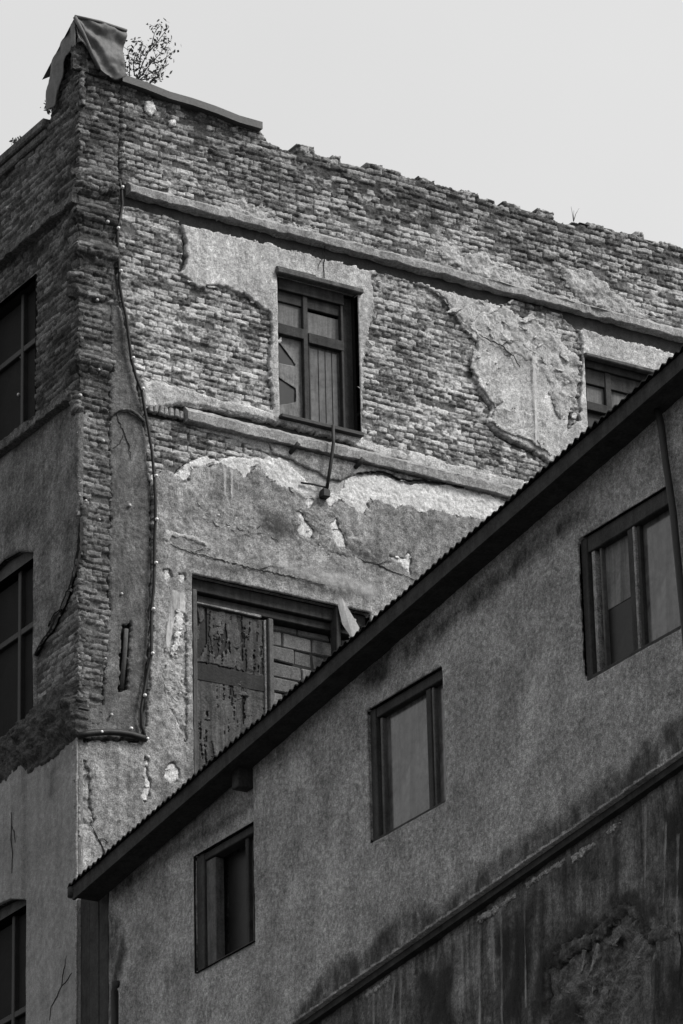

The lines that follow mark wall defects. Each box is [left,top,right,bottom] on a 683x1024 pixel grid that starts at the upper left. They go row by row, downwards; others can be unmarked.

spalling [115,205,282,411]
spalling [357,273,583,482]
flaking render [142,416,505,562]
crack [357,470,465,489]
peeling [162,606,265,769]
flaking render [141,755,179,801]
water stain [501,719,683,868]
crack [49,956,71,1021]
water stain [299,927,397,1015]
water stain [412,871,489,934]
water stain [478,892,604,1024]
water stain [663,795,683,942]